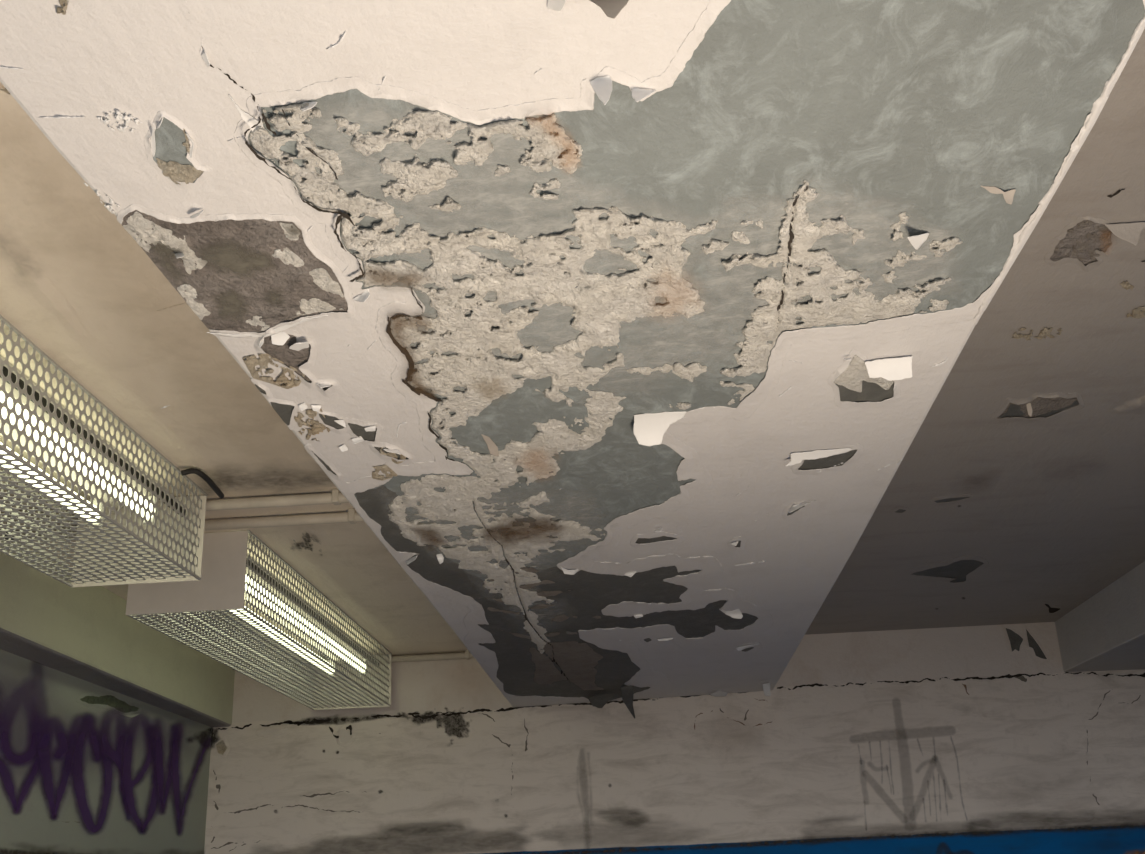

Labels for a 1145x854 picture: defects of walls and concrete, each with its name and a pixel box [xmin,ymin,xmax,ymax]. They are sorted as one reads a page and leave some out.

peeling [57,0,69,15]
crack [202,47,363,282]
crack [777,186,808,320]
crack [386,287,468,477]
peeling [76,0,1145,719]
damp [188,728,218,748]
damp [299,715,382,725]
damp [399,708,469,744]
crack [218,502,1145,805]